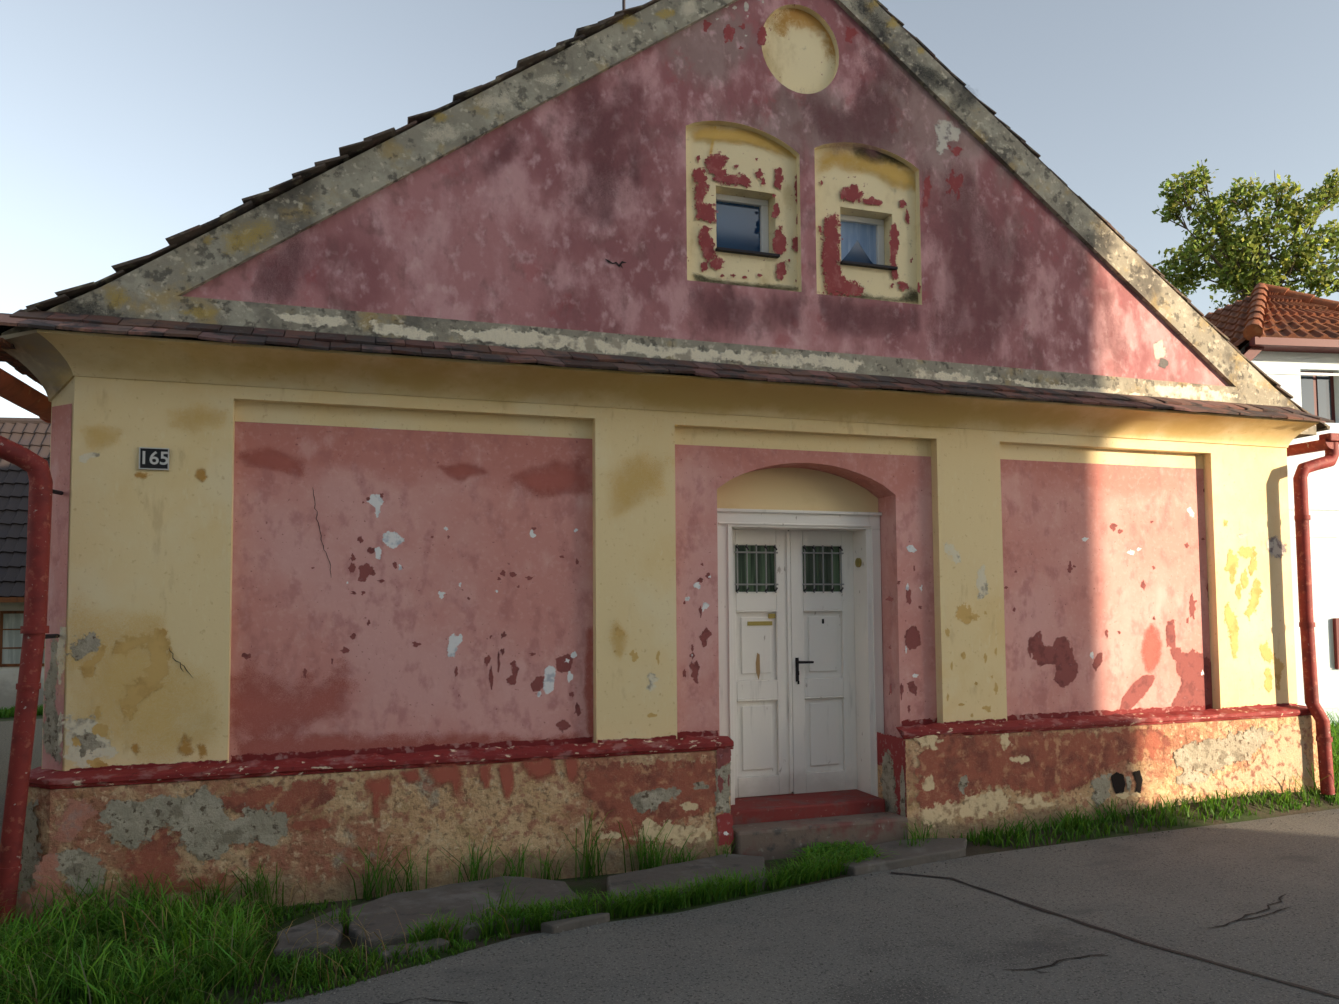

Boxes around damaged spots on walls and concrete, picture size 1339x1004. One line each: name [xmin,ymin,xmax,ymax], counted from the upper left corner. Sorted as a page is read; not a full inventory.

peeling [691,151,798,281]
peeling [818,119,964,297]
peeling [277,312,862,373]
peeling [42,627,172,768]
crack [312,487,331,573]
peeling [484,631,581,731]
peeling [1027,631,1103,688]
peeling [877,648,1310,827]
peeling [1153,584,1213,709]
peeling [1223,520,1287,659]
peeling [1259,640,1285,692]
spalling [99,776,337,865]